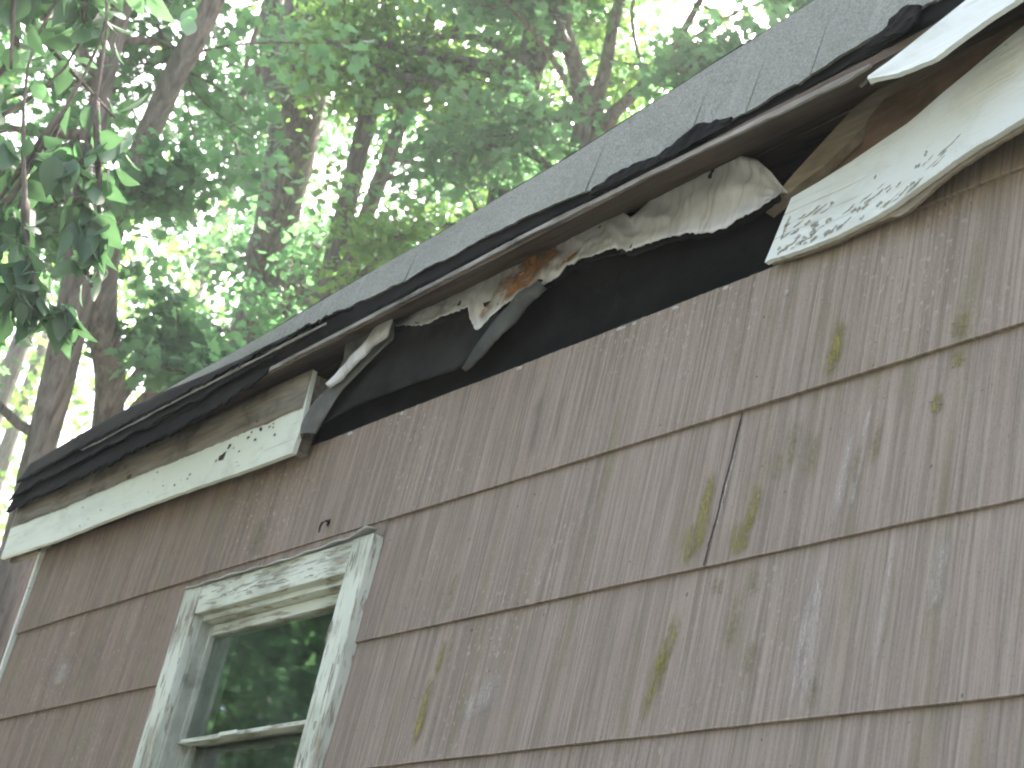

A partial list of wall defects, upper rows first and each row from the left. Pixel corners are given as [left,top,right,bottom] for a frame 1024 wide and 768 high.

rust [499,246,577,299]
crack [703,413,743,566]